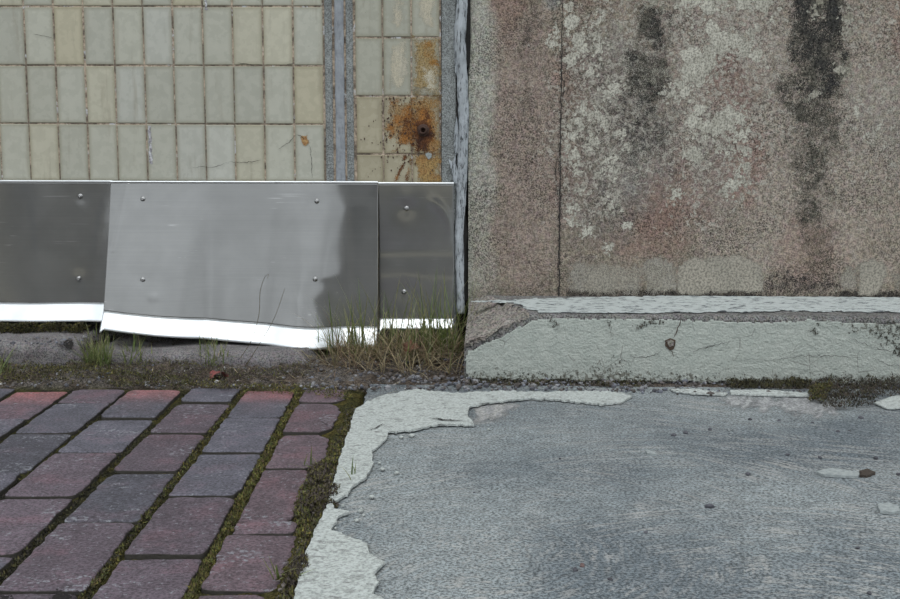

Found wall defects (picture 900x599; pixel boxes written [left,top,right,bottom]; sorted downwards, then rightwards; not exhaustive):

corrosion [361,35,442,182]
leakage [566,0,900,297]
spalling [464,295,529,347]
peeling [670,389,845,419]
peeling [874,395,900,409]
peeling [294,388,632,599]